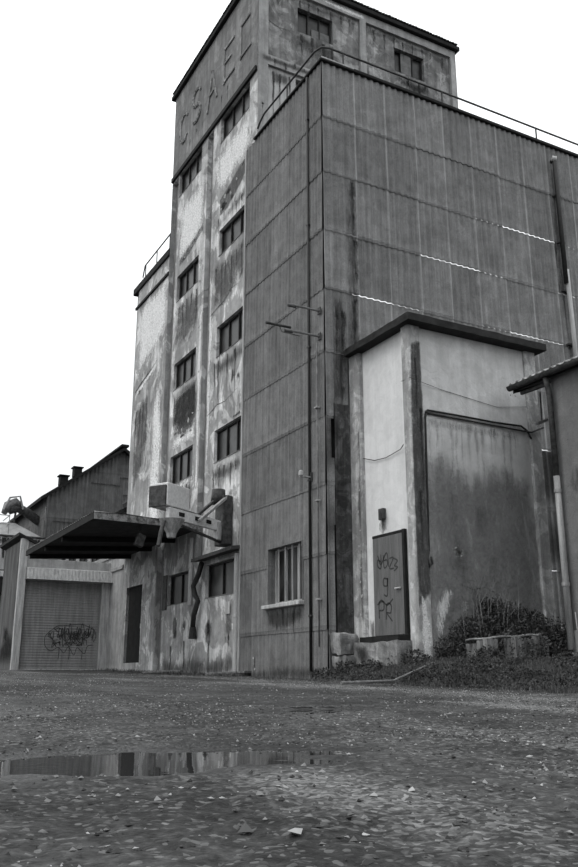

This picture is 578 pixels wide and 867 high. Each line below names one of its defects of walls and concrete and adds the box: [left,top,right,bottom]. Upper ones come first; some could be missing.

damp [265,56,308,114]
damp [335,183,358,396]
damp [173,382,195,427]